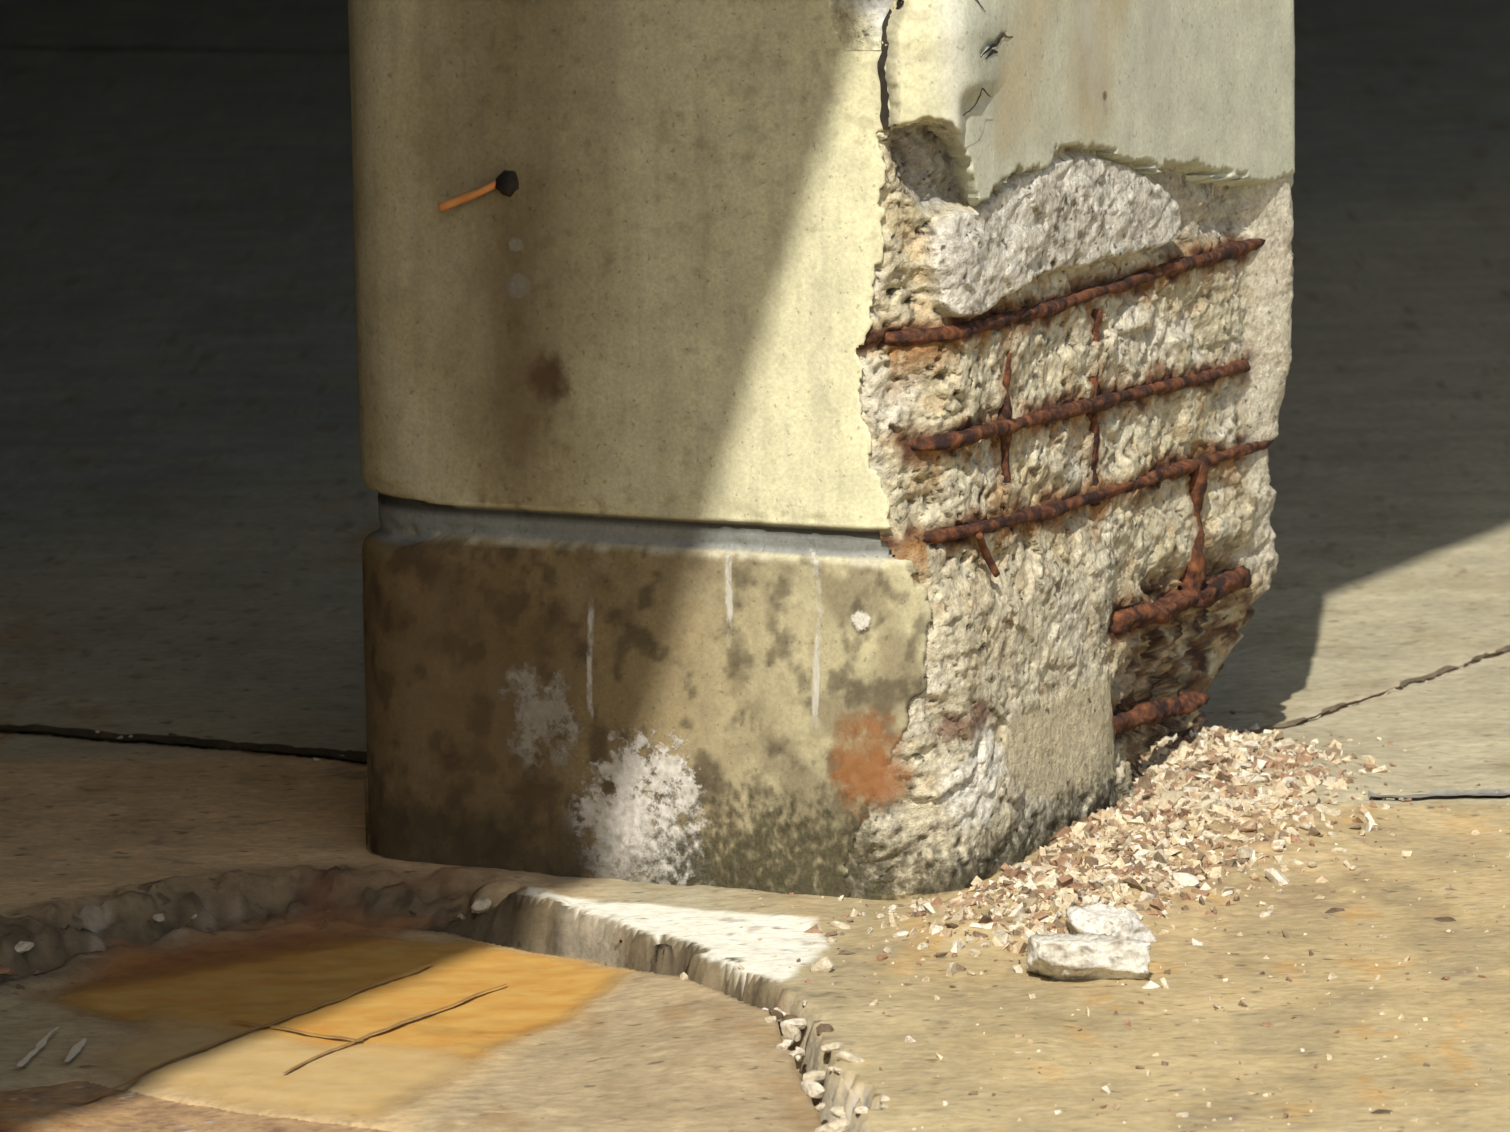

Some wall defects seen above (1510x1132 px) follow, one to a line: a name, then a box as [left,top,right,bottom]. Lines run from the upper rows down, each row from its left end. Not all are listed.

crack [877,0,904,130]
spalling [828,0,1294,896]
water stain [502,665,579,765]
rust [832,714,910,803]
crack [1238,645,1510,735]
crack [78,963,506,1104]